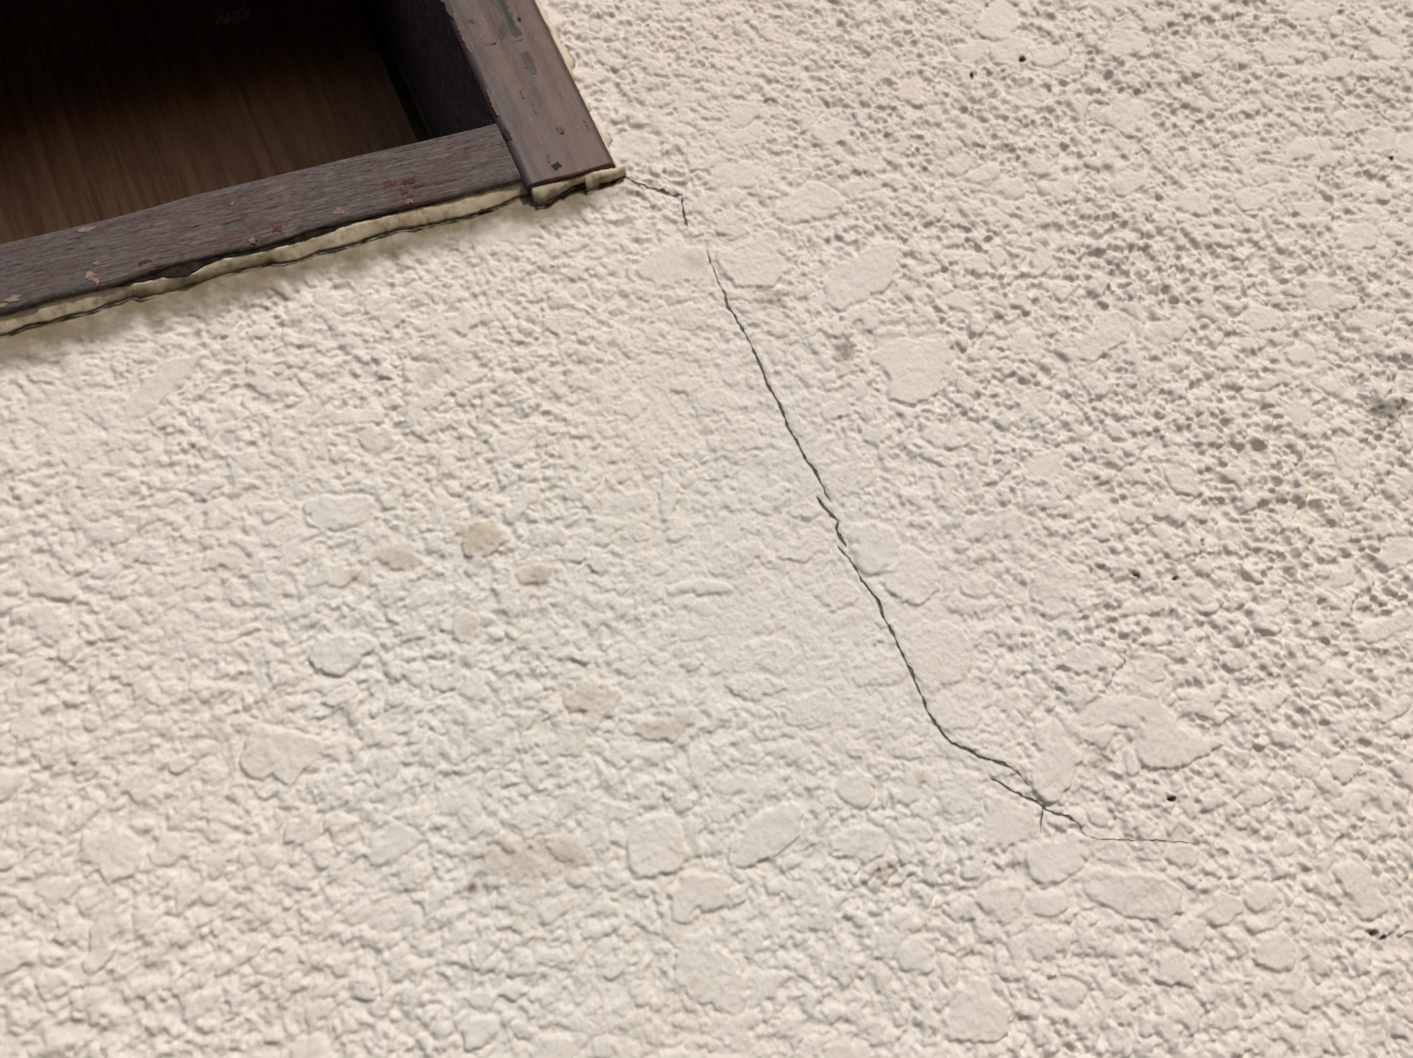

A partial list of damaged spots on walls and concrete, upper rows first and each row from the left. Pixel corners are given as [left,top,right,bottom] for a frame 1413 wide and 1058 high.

crack [225,175,1200,845]